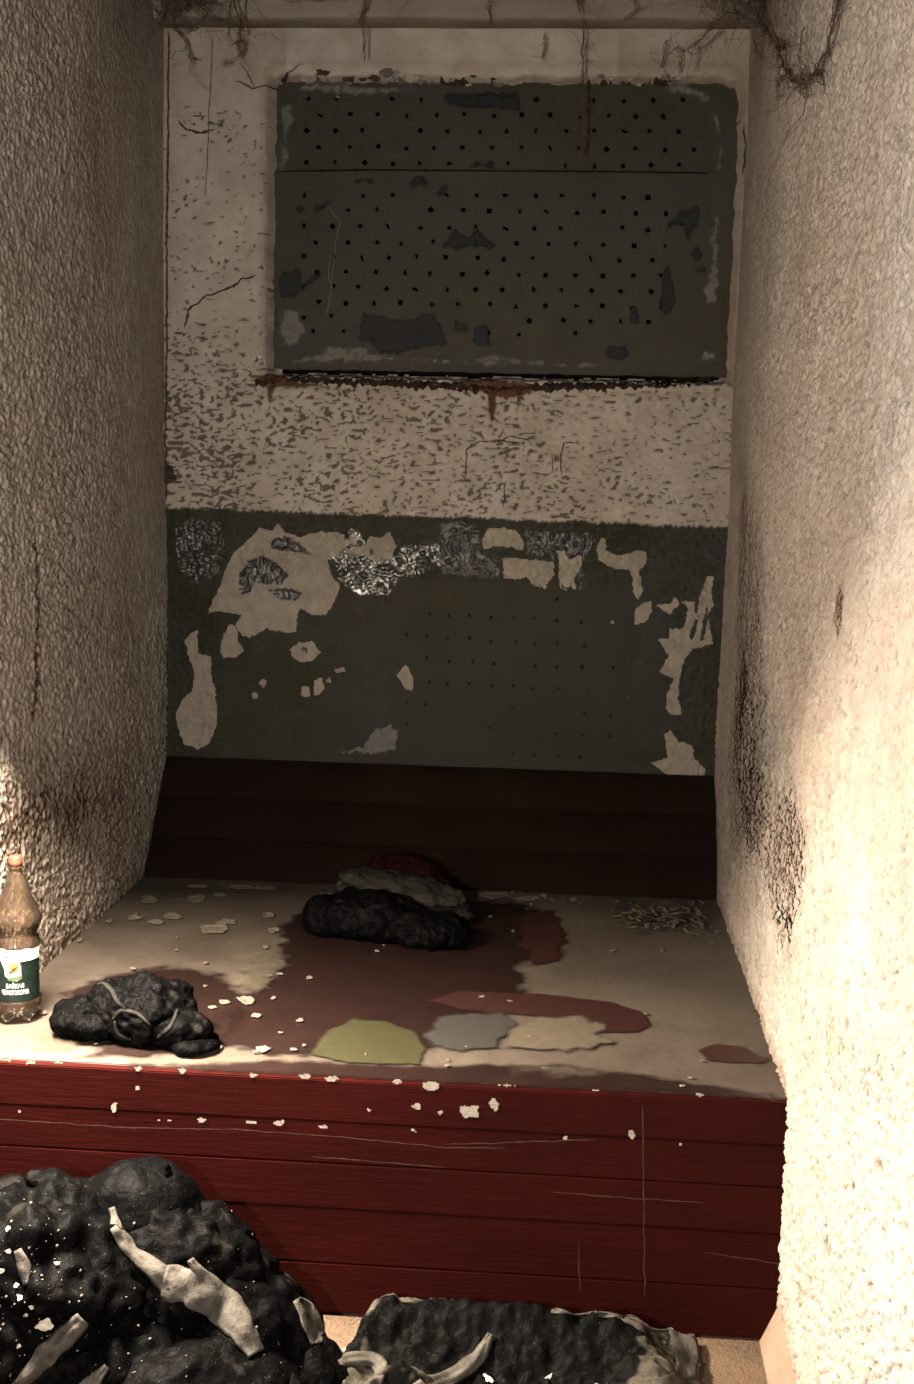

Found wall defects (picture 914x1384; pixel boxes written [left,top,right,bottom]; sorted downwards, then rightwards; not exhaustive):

rust [254,374,317,401]
rust [457,379,536,421]
peeling [176,524,396,750]
peeling [482,527,714,776]
peeling [397,665,413,691]
peeling [342,724,399,755]